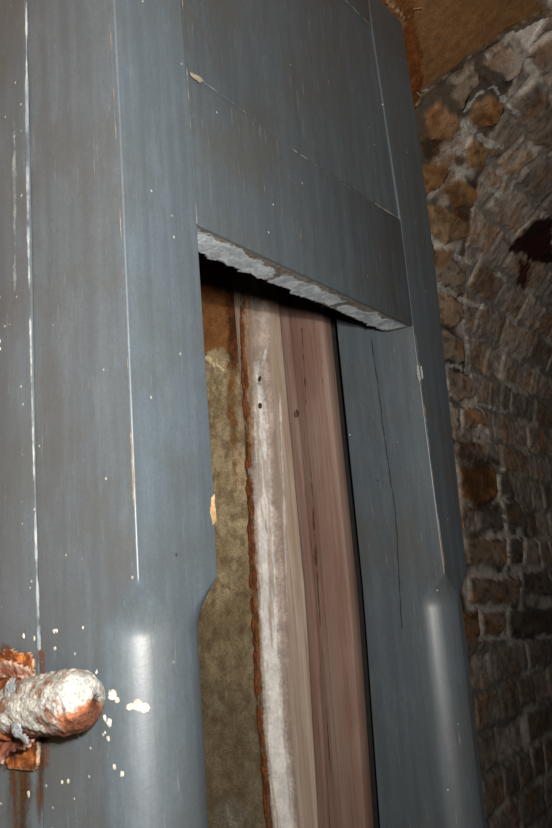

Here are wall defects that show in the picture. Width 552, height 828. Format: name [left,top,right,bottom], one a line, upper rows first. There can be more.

corrosion [225,266,274,828]
crack [371,340,402,629]
corrosion [4,740,47,828]